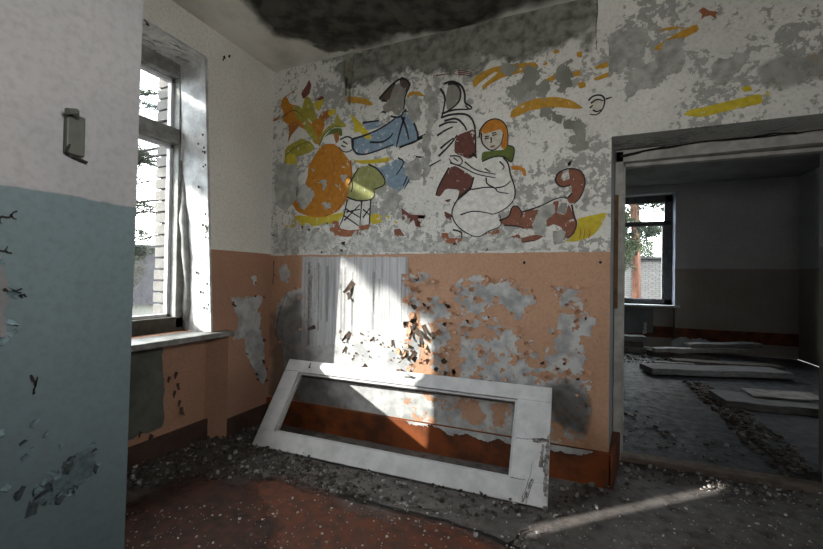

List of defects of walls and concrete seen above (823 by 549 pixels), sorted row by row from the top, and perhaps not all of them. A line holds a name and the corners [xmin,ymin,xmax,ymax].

peeling [404,80,440,186]
peeling [272,161,576,254]
peeling [231,275,268,385]
peeling [274,264,599,497]